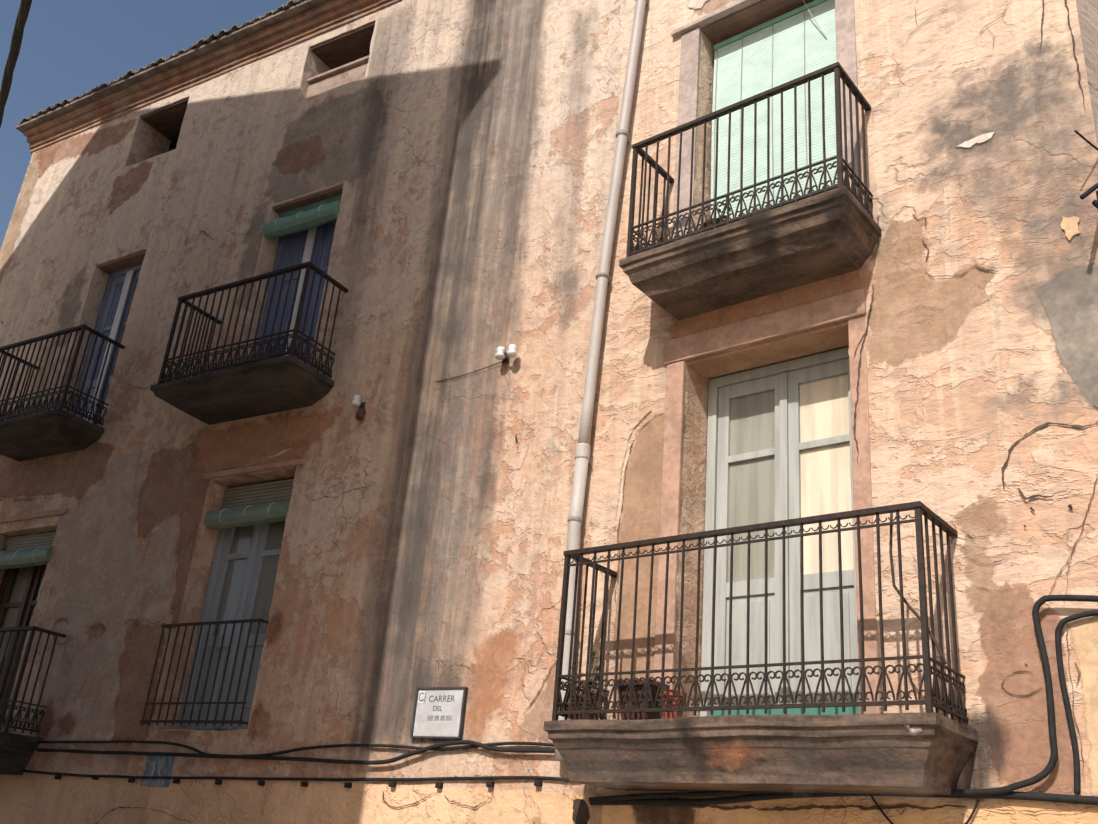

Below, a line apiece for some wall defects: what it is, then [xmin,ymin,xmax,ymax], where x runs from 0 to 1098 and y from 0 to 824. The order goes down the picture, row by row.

crack [901,0,962,47]
crack [1040,0,1085,108]
damp [937,79,1026,151]
damp [1029,192,1087,246]
peeling [670,214,995,366]
damp [362,0,534,744]
crack [853,285,874,463]
peeling [136,443,214,628]
peeling [957,495,999,539]
crack [1049,476,1098,595]
peeling [966,553,1098,813]
damp [633,798,695,824]